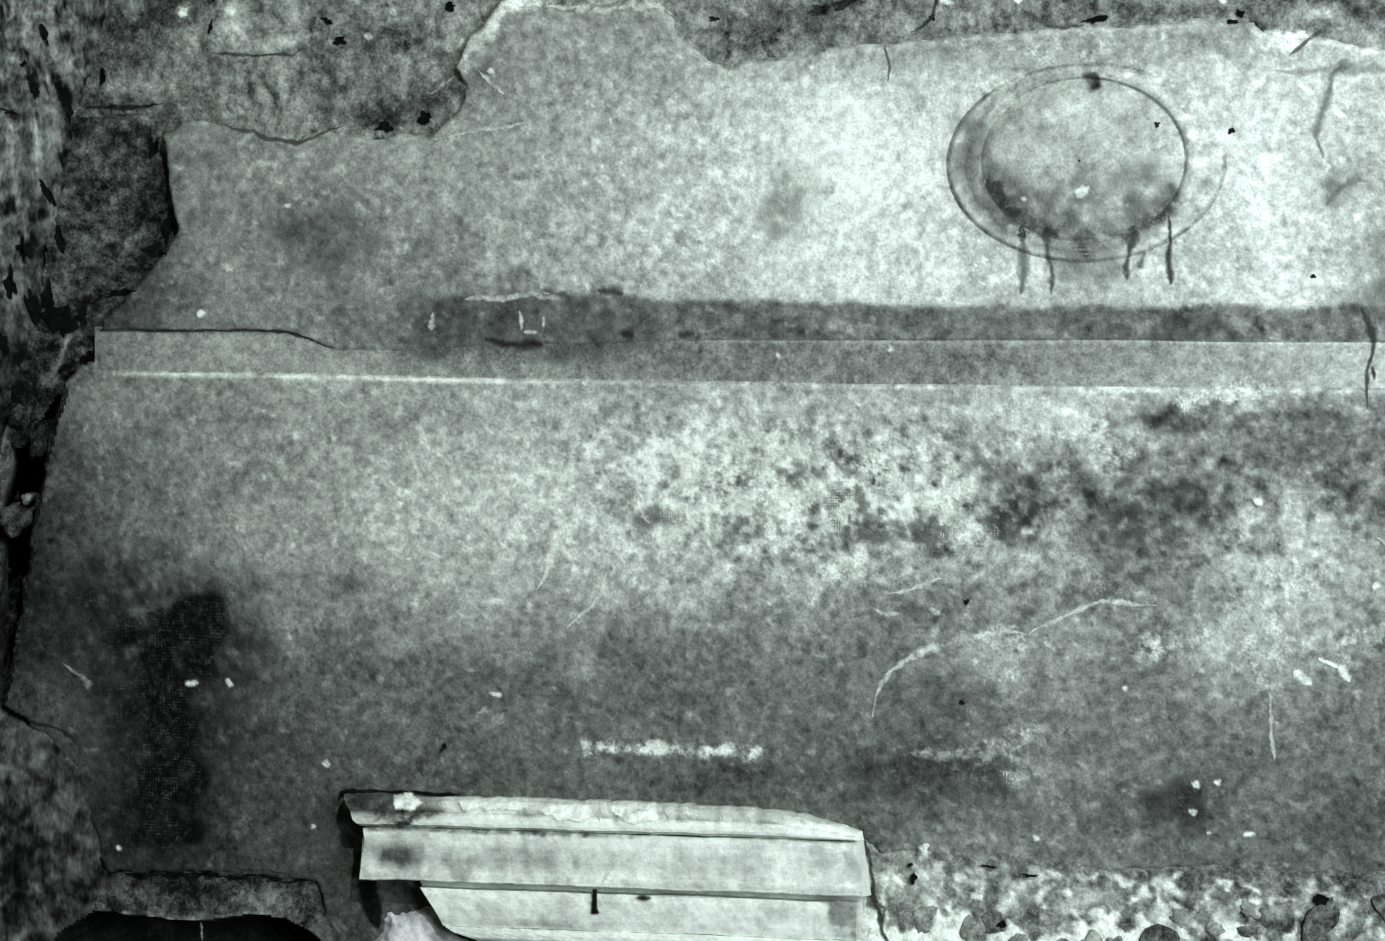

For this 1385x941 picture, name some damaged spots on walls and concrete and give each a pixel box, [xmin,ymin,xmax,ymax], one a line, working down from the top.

spalling [0,0,1385,448]
leakage [990,181,1055,294]
leakage [1123,196,1176,284]
leakage [485,338,543,348]
crack [1361,308,1377,407]
peeling [1011,395,1137,466]
crack [5,707,81,755]
leakage [63,547,271,879]
spalling [864,839,1385,941]